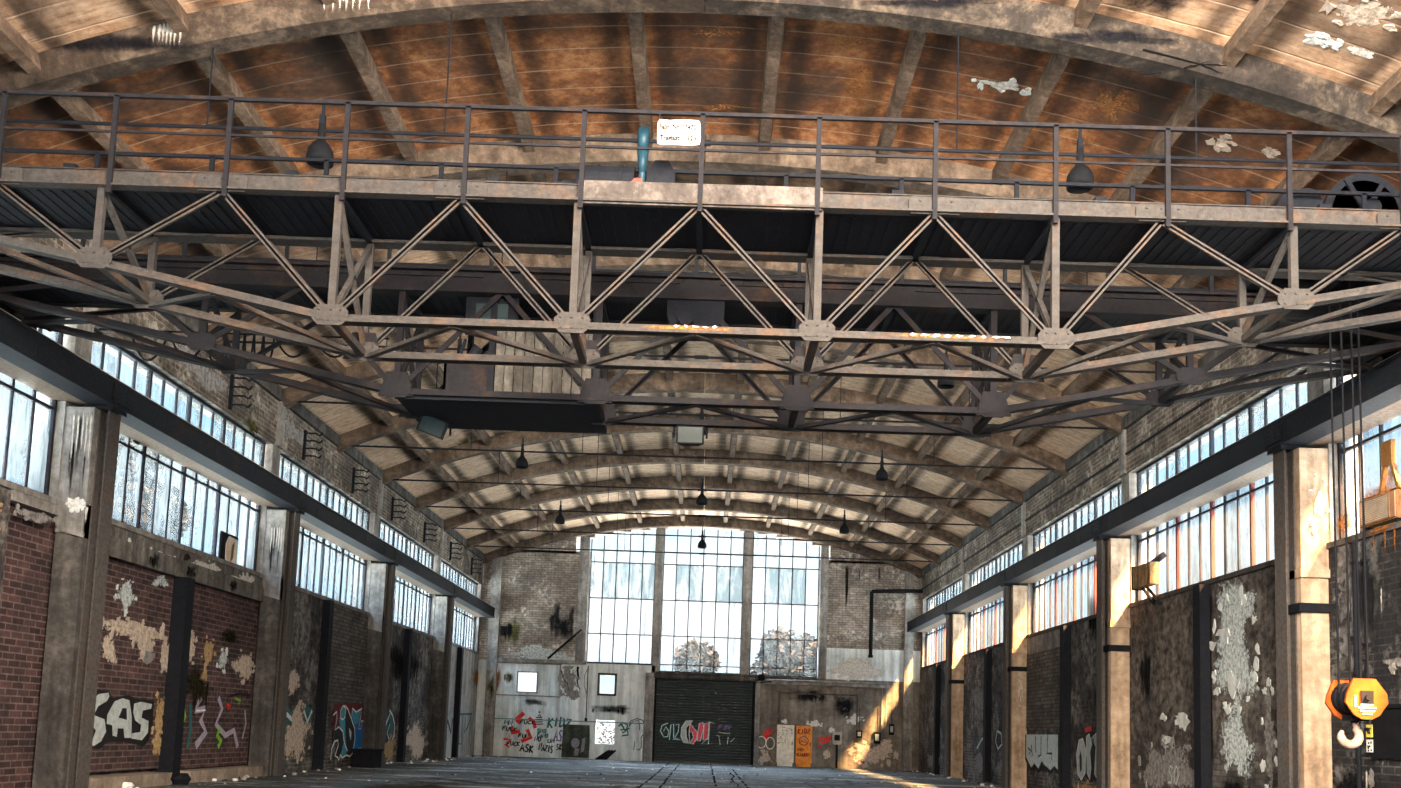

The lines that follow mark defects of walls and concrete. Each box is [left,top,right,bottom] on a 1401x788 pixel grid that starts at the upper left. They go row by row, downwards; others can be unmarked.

peeling [1303,0,1401,59]
peeling [971,78,1031,96]
peeling [1205,134,1237,152]
peeling [1261,145,1281,159]
peeling [0,497,88,530]
peeling [101,616,169,674]
peeling [191,630,255,685]
peeling [1209,579,1278,788]
peeling [1383,657,1401,675]
flaking render [1137,712,1194,788]